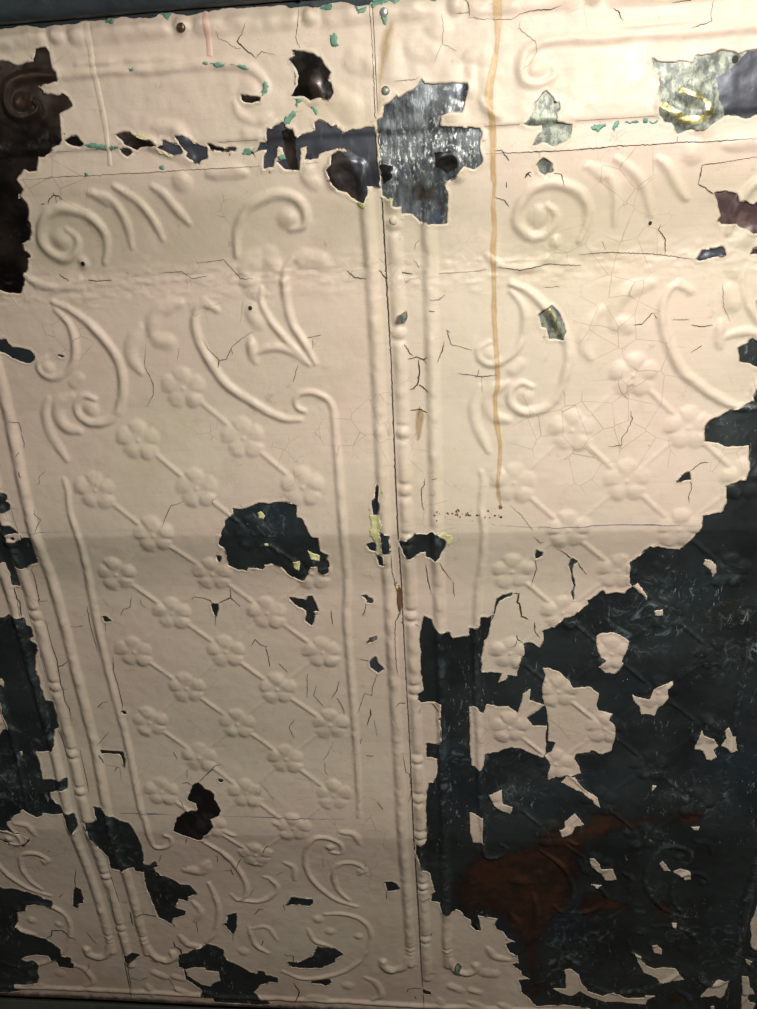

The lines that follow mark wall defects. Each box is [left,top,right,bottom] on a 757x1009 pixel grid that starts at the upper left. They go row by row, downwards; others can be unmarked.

peeling [0,43,87,298]
peeling [110,45,488,230]
peeling [647,43,757,140]
peeling [692,187,757,265]
peeling [0,489,41,589]
peeling [213,498,333,628]
peeling [362,528,450,569]
peeling [412,386,757,1009]
peeling [0,612,200,927]
peeling [170,777,226,842]
peeling [0,885,77,994]
rust [457,814,642,963]